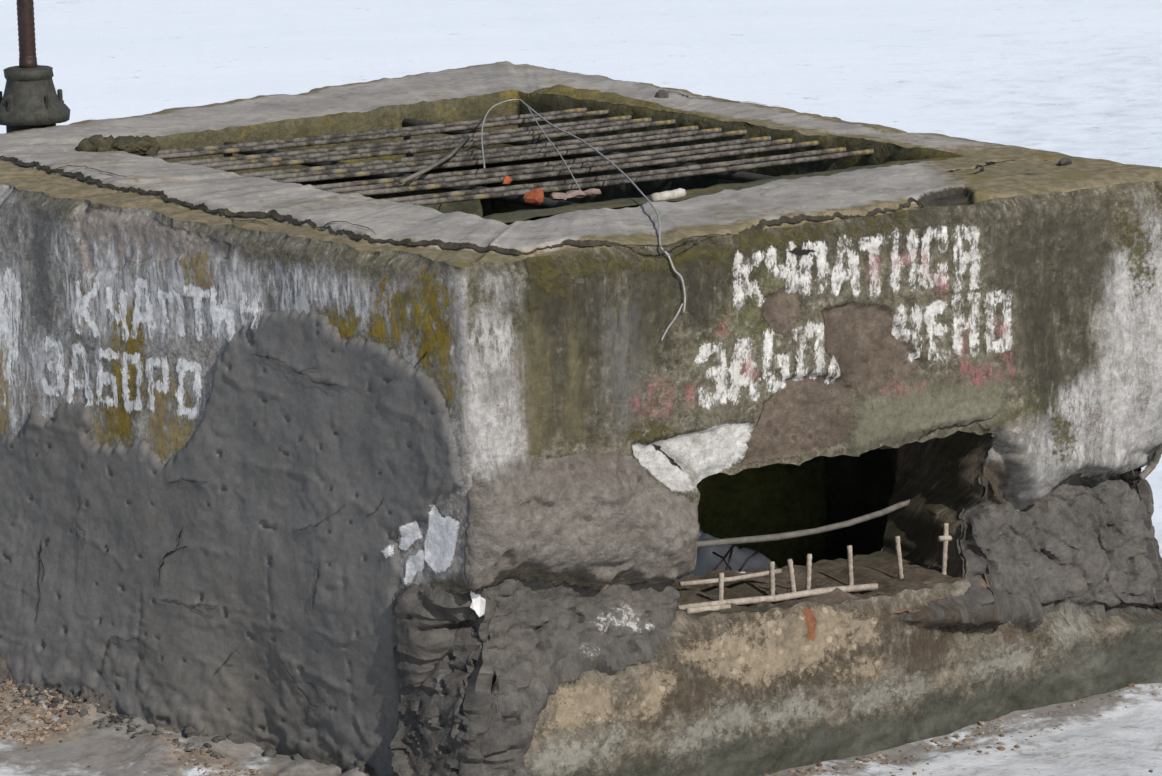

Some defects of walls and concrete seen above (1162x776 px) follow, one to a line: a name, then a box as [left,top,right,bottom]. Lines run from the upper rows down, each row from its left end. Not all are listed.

peeling [54,202,399,344]
peeling [0,262,66,432]
water stain [451,273,552,477]
water stain [565,291,587,437]
water stain [1026,211,1162,485]
crack [36,545,44,619]
crack [159,528,219,617]
crack [215,651,234,674]
crack [296,499,383,531]
peeling [381,505,460,585]
peeling [470,591,486,617]
rust [639,601,998,727]